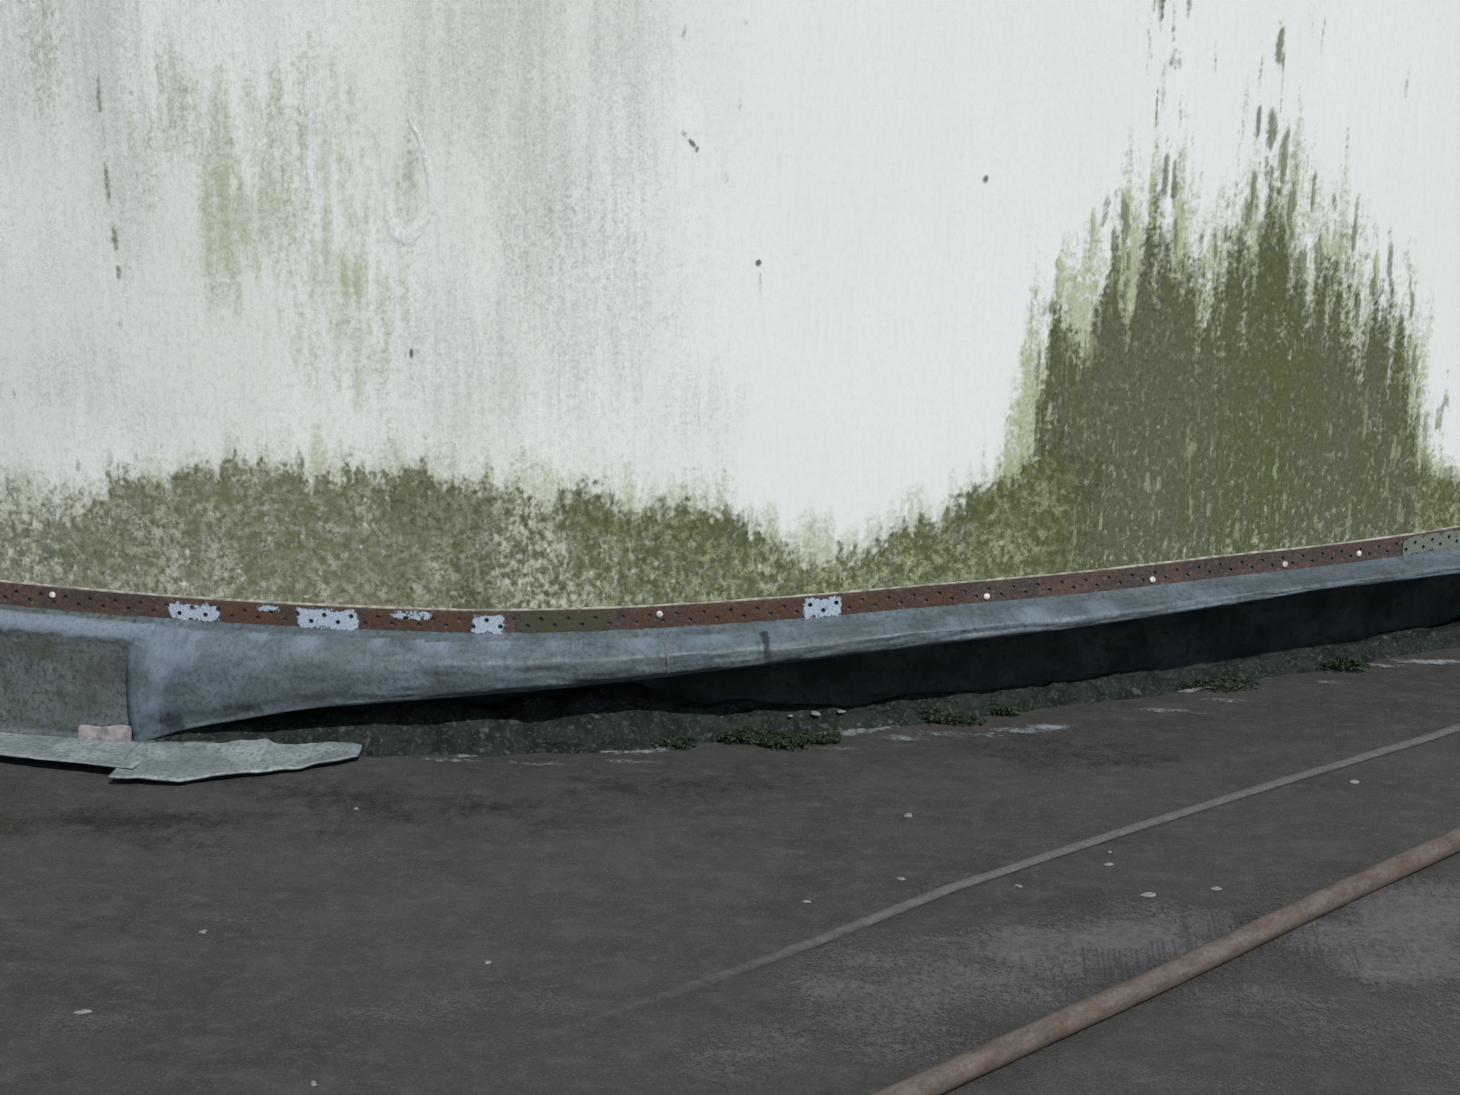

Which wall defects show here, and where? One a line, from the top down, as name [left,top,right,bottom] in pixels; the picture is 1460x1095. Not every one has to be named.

water stain [1090,100,1325,338]
water stain [1045,256,1063,312]
water stain [1344,197,1415,339]
water stain [1370,343,1449,523]
water stain [1186,411,1213,517]
water stain [1143,472,1161,524]
rust [215,601,295,626]
rust [358,610,488,632]
rust [622,600,809,629]
rust [838,587,964,615]
water stain [1007,607,1055,625]
water stain [1085,601,1119,617]